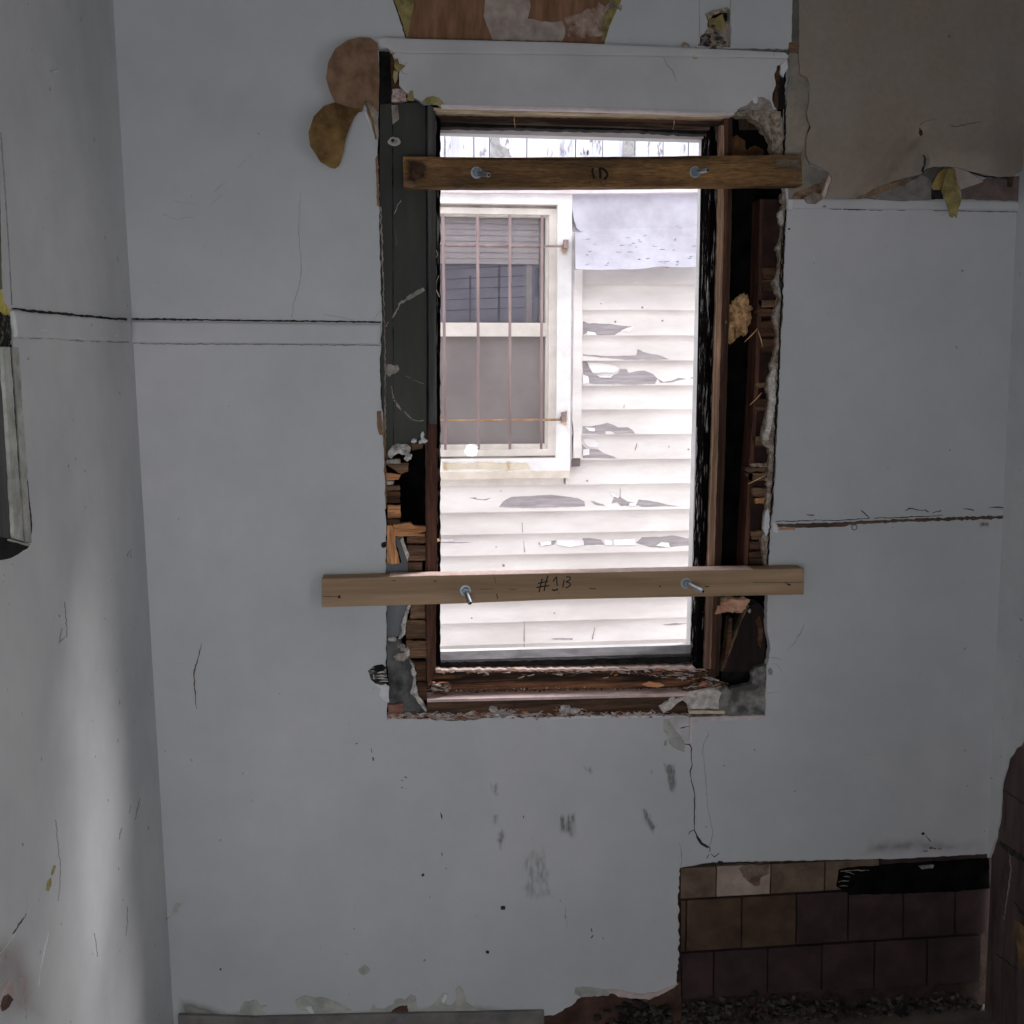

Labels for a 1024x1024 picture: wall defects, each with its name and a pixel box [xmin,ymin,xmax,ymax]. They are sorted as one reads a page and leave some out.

peeling [393,0,622,44]
peeling [308,37,443,249]
spalling [729,0,831,566]
spalling [377,330,427,573]
spalling [721,326,749,566]
flaking render [368,604,432,713]
flaking render [659,635,767,753]
spalling [720,612,736,654]
spalling [720,595,765,608]
crack [679,729,713,867]
peeling [574,983,678,1000]